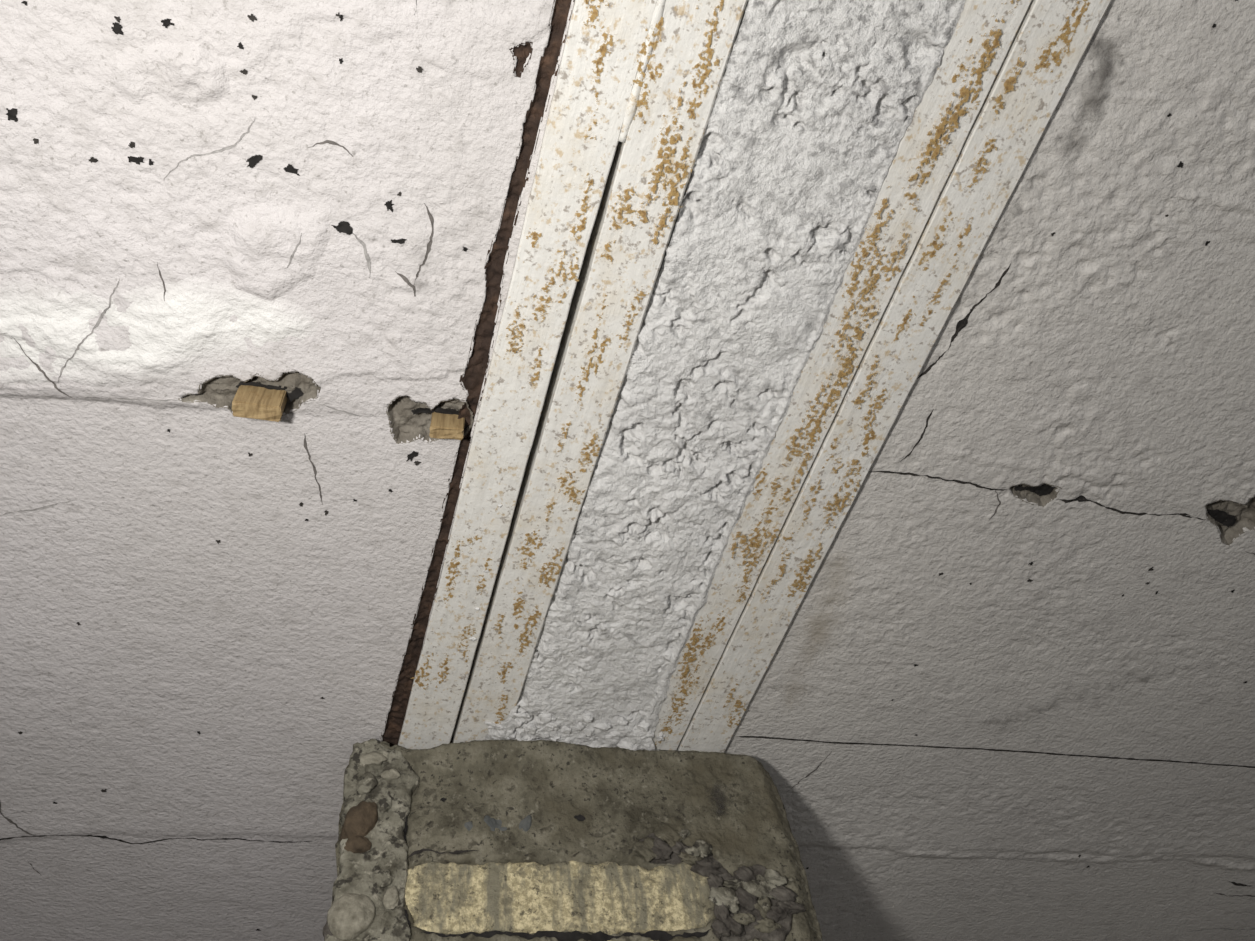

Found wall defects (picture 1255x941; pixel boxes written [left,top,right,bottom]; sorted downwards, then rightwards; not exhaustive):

rust [600,0,724,262]
spalling [178,371,320,416]
spalling [386,396,474,466]
rust [380,0,619,747]
rust [576,286,649,410]
rust [655,0,1090,748]
crack [874,410,1007,519]
crack [917,264,1011,379]
spalling [1010,483,1060,507]
spalling [1206,497,1255,546]
crack [736,736,1255,792]
crack [403,905,712,941]